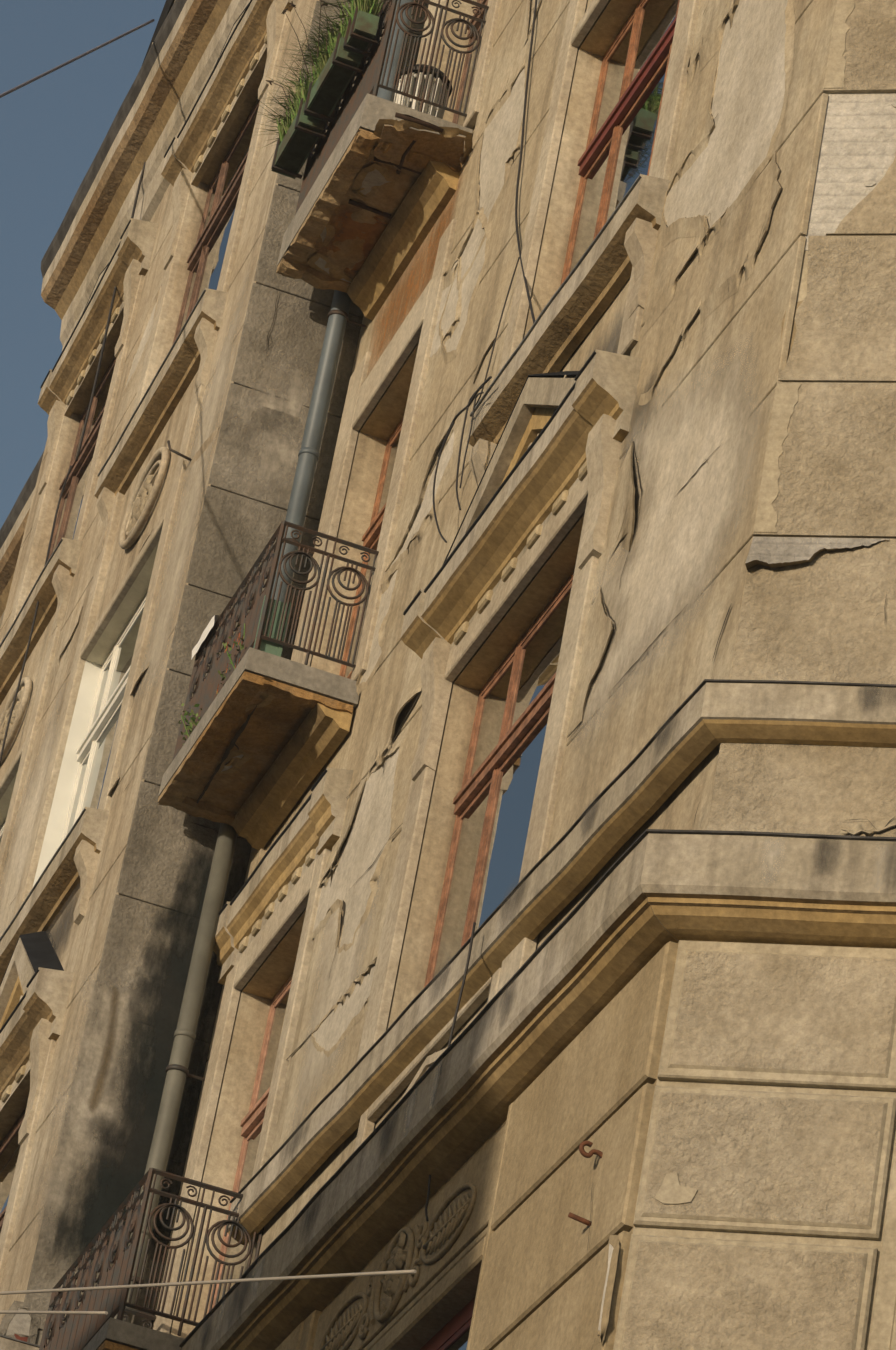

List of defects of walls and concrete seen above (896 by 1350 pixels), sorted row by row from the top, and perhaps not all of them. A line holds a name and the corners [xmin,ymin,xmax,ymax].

flaking render [369,60,528,365]
crack [637,0,782,411]
flaking render [663,0,796,246]
water stain [222,859,247,907]
water stain [54,851,223,1259]